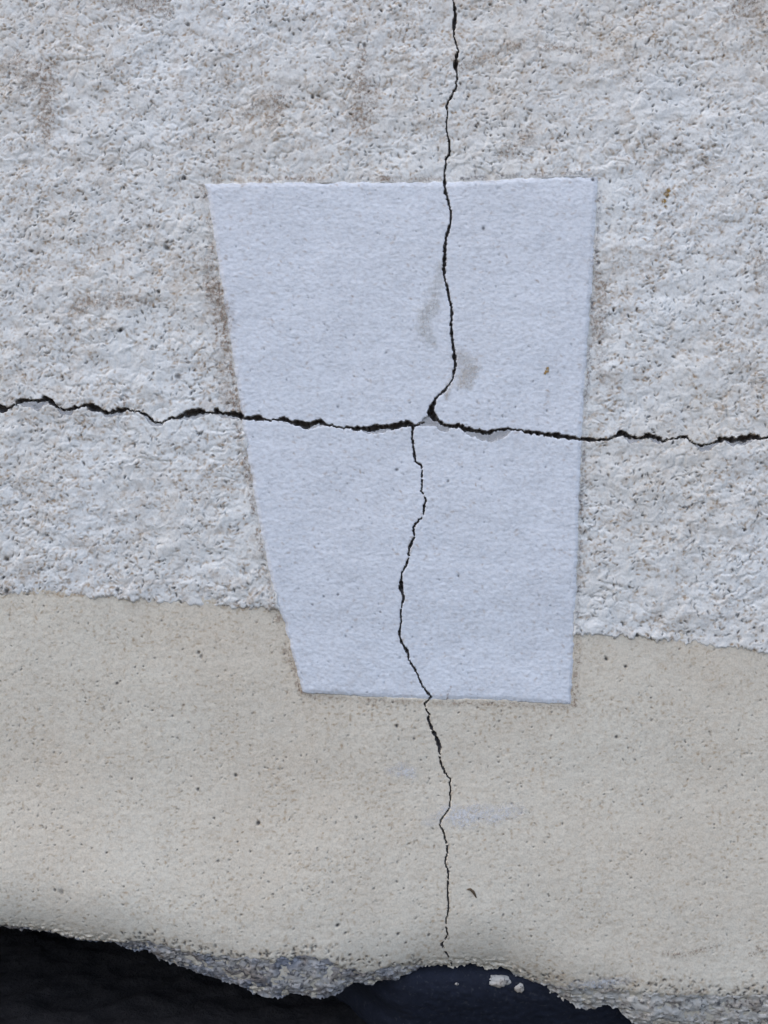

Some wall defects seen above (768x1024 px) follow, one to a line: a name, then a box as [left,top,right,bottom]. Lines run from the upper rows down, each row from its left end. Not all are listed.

crack [0,2,768,469]
crack [398,473,451,917]
flaking render [0,925,423,999]
flaking render [489,971,768,1024]